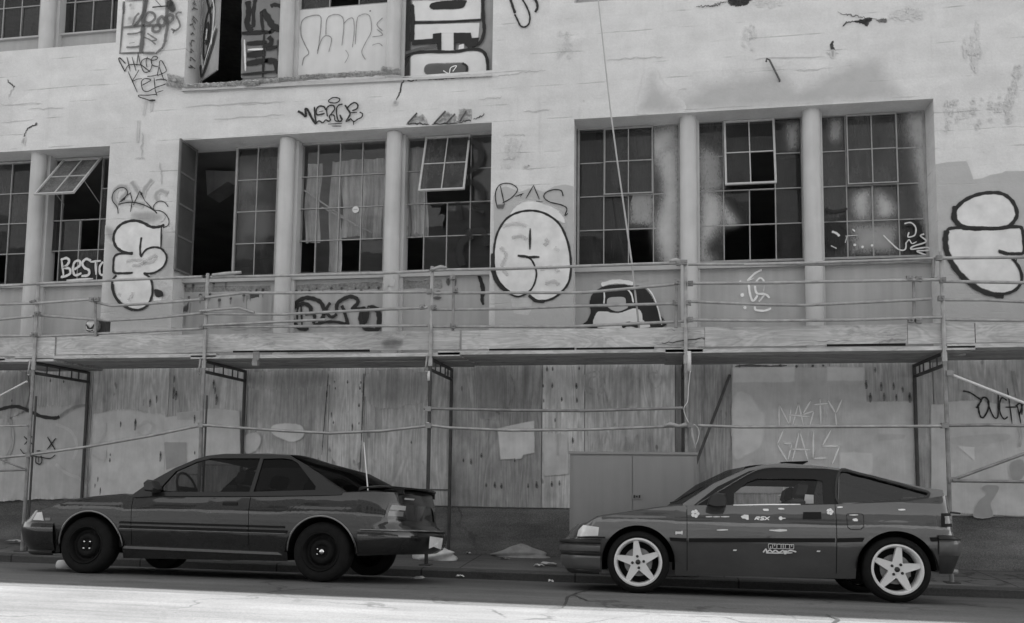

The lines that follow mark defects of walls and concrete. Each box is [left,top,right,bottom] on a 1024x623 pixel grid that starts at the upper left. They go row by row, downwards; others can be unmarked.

crack [754,41,837,71]